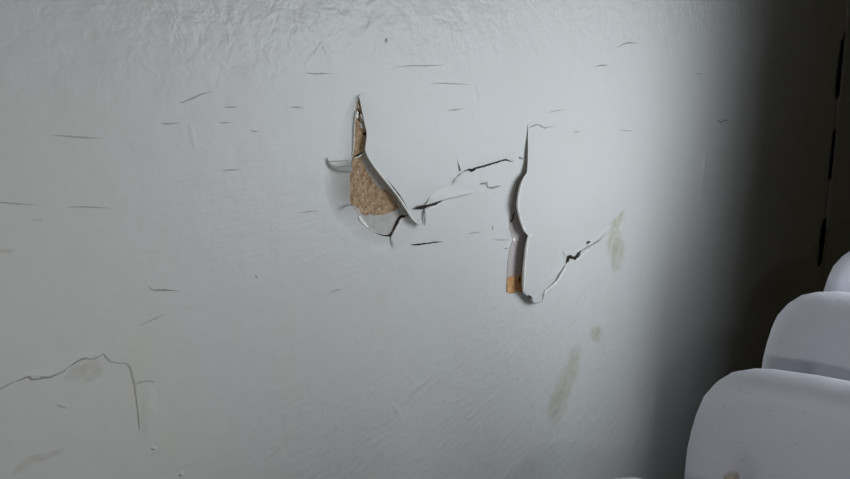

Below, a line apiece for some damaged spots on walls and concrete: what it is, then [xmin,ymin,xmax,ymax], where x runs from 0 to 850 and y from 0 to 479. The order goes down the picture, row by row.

peeling [325,92,443,249]
crack [414,150,525,210]
peeling [499,116,660,304]
crack [818,34,845,266]
crack [0,349,155,430]